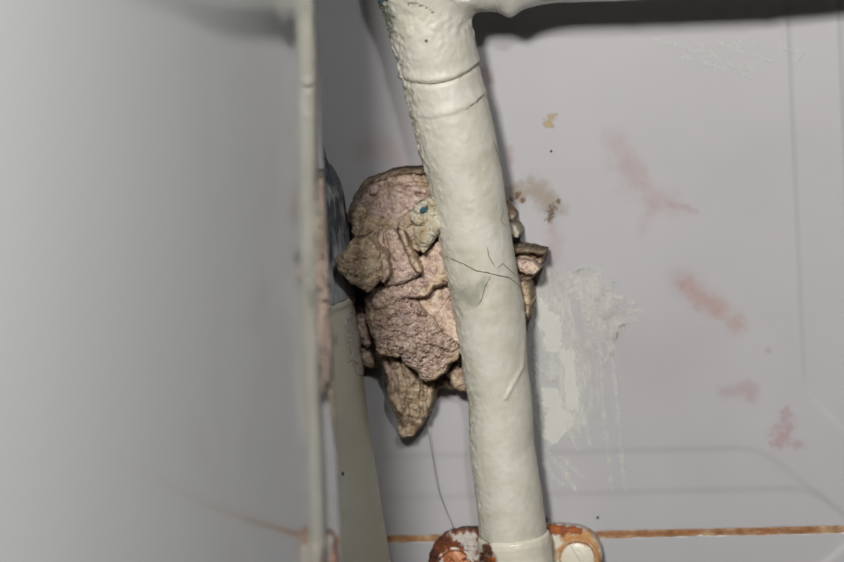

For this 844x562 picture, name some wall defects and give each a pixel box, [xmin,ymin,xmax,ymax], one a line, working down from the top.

crack [452,248,522,306]
corrosion [479,543,496,562]
corrosion [546,518,601,562]